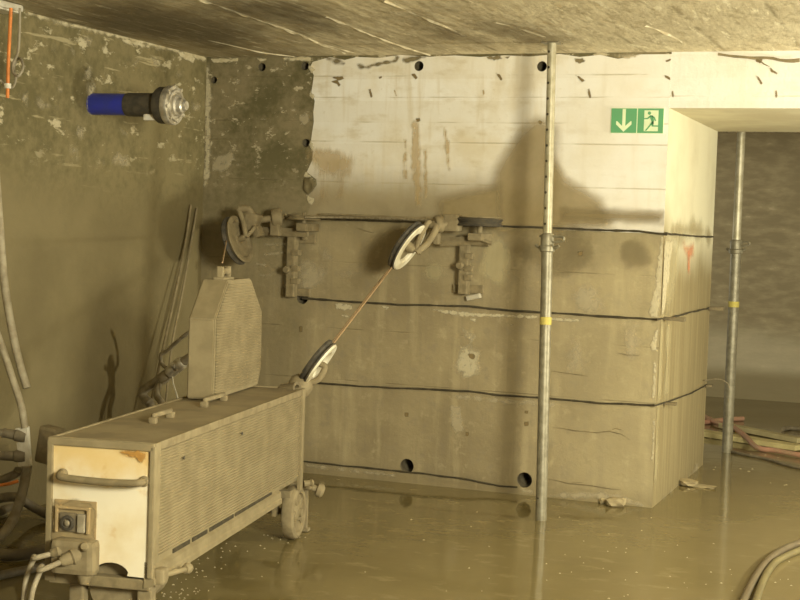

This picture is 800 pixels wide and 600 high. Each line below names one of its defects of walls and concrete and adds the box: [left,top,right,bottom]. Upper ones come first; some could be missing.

spalling [649,237,672,317]
crack [552,427,626,437]
crack [550,479,619,490]